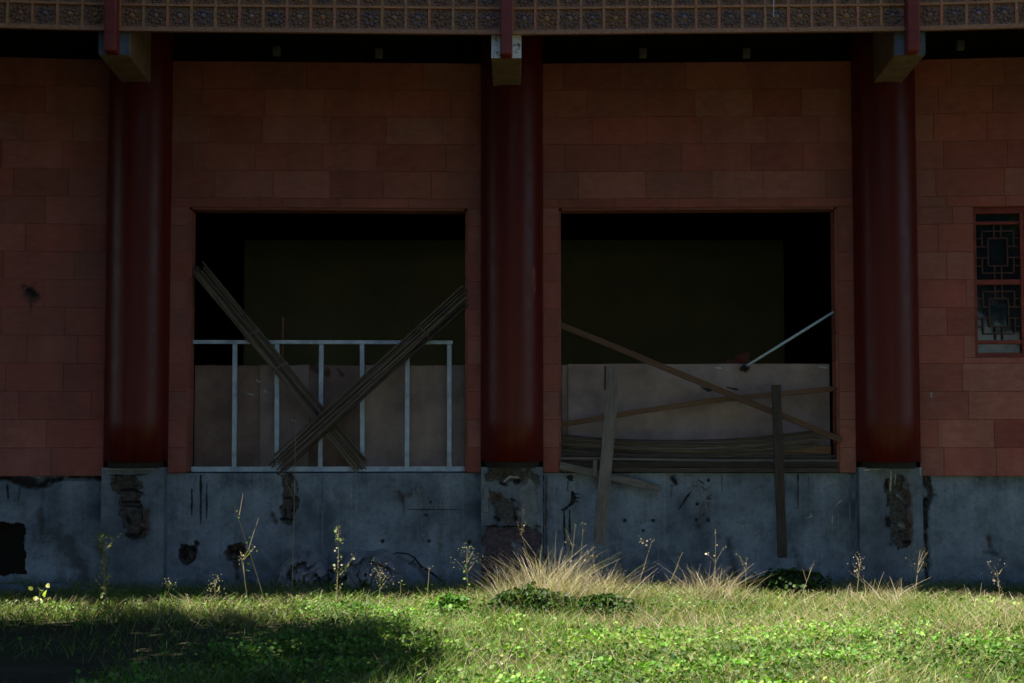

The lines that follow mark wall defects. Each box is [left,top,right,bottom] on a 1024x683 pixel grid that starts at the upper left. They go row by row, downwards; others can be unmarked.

spalling [0,468,155,539]
spalling [179,541,199,565]
spalling [271,473,300,525]
peeling [469,468,543,589]
spalling [863,467,933,581]